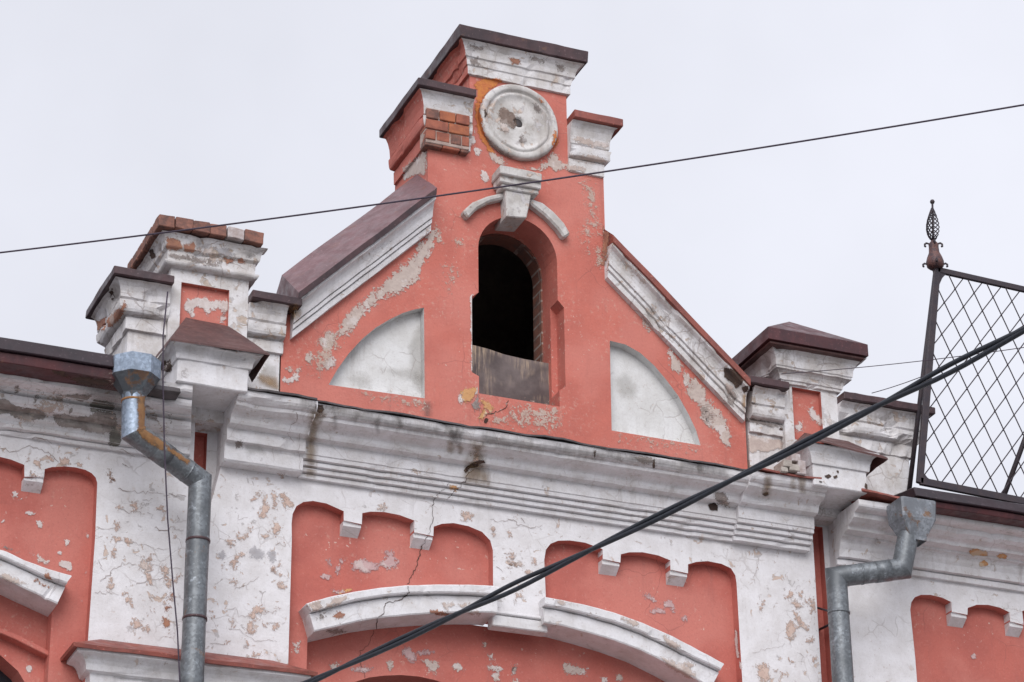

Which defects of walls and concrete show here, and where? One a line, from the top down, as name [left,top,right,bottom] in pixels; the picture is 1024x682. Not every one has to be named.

flaking render [402,78,527,180]
flaking render [149,238,245,267]
flaking render [96,288,127,332]
peeling [184,296,230,323]
peeling [282,225,463,383]
peeling [458,387,565,434]
peeling [667,347,743,448]
peeling [138,553,183,638]
peeling [224,605,280,659]
peeling [219,490,294,589]
peeling [306,549,400,635]
crack [359,472,470,681]